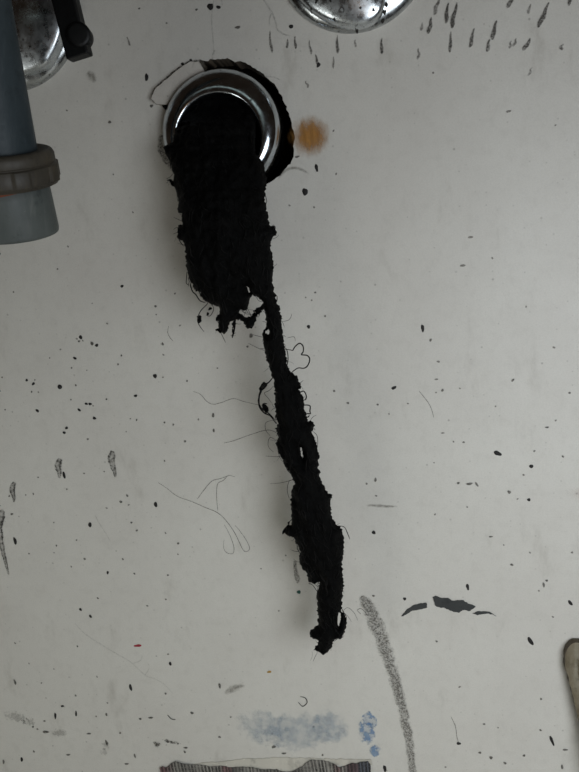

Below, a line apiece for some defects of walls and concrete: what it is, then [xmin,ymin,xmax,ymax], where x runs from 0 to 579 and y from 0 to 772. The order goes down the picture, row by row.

peeling [151,60,205,110]
rust [298,121,324,150]
peeling [401,596,495,617]